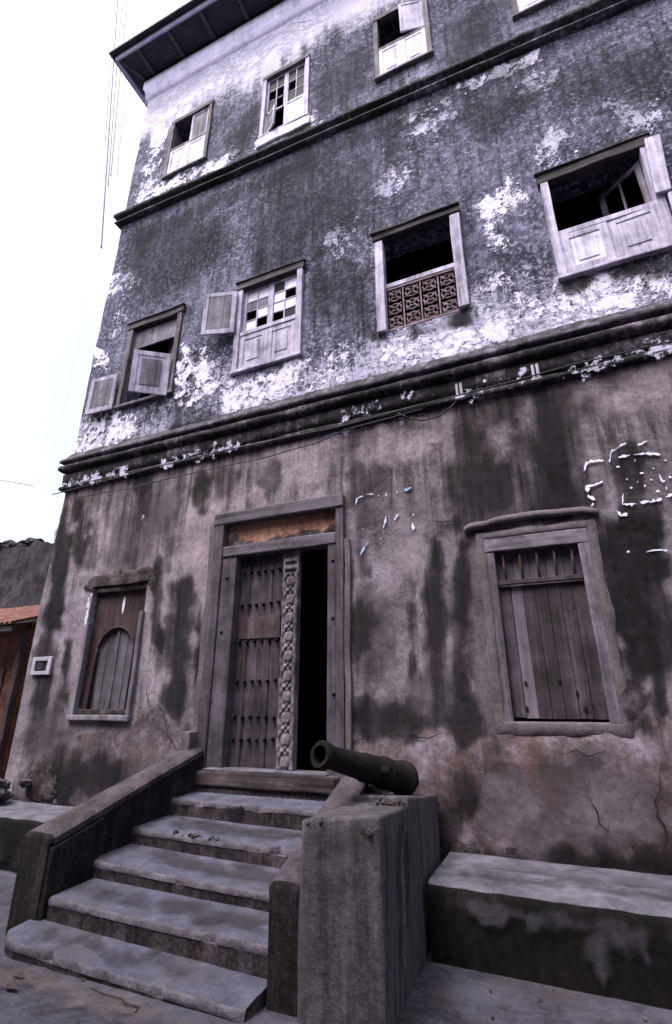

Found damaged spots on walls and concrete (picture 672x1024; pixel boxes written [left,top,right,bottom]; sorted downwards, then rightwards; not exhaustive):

peeling [472,176,535,252]
peeling [174,338,363,416]
peeling [376,267,672,374]
peeling [568,338,672,381]
peeling [70,409,148,453]
leakage [191,467,225,514]
leakage [351,391,592,747]
leakage [597,441,672,730]
leakage [27,474,202,806]
crack [134,678,176,748]
leakage [438,770,479,857]
crack [652,768,672,869]